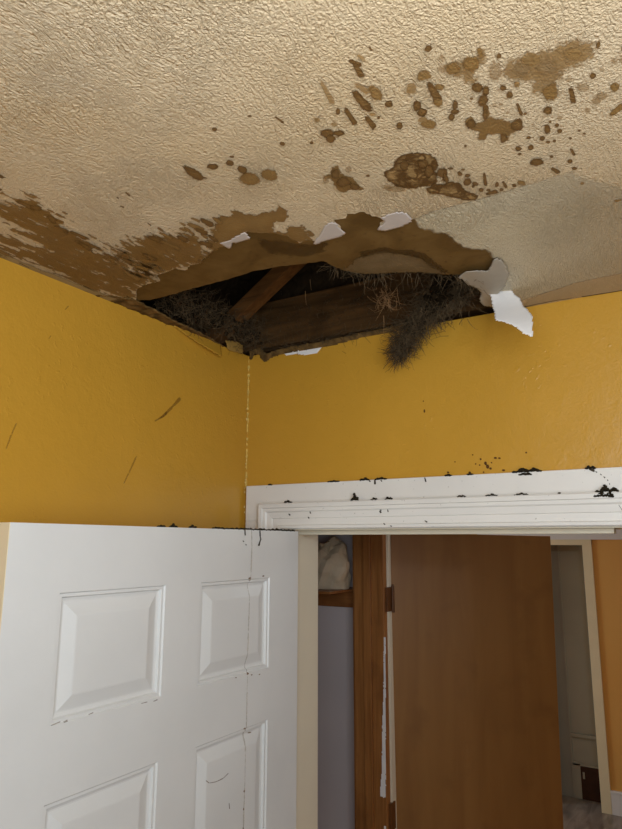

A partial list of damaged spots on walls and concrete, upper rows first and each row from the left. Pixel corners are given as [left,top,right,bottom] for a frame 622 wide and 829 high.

leakage [314,47,393,143]
leakage [406,70,444,129]
leakage [444,37,600,174]
leakage [585,82,620,113]
leakage [182,156,277,185]
leakage [324,166,364,193]
leakage [384,152,526,201]
spalling [95,212,533,493]